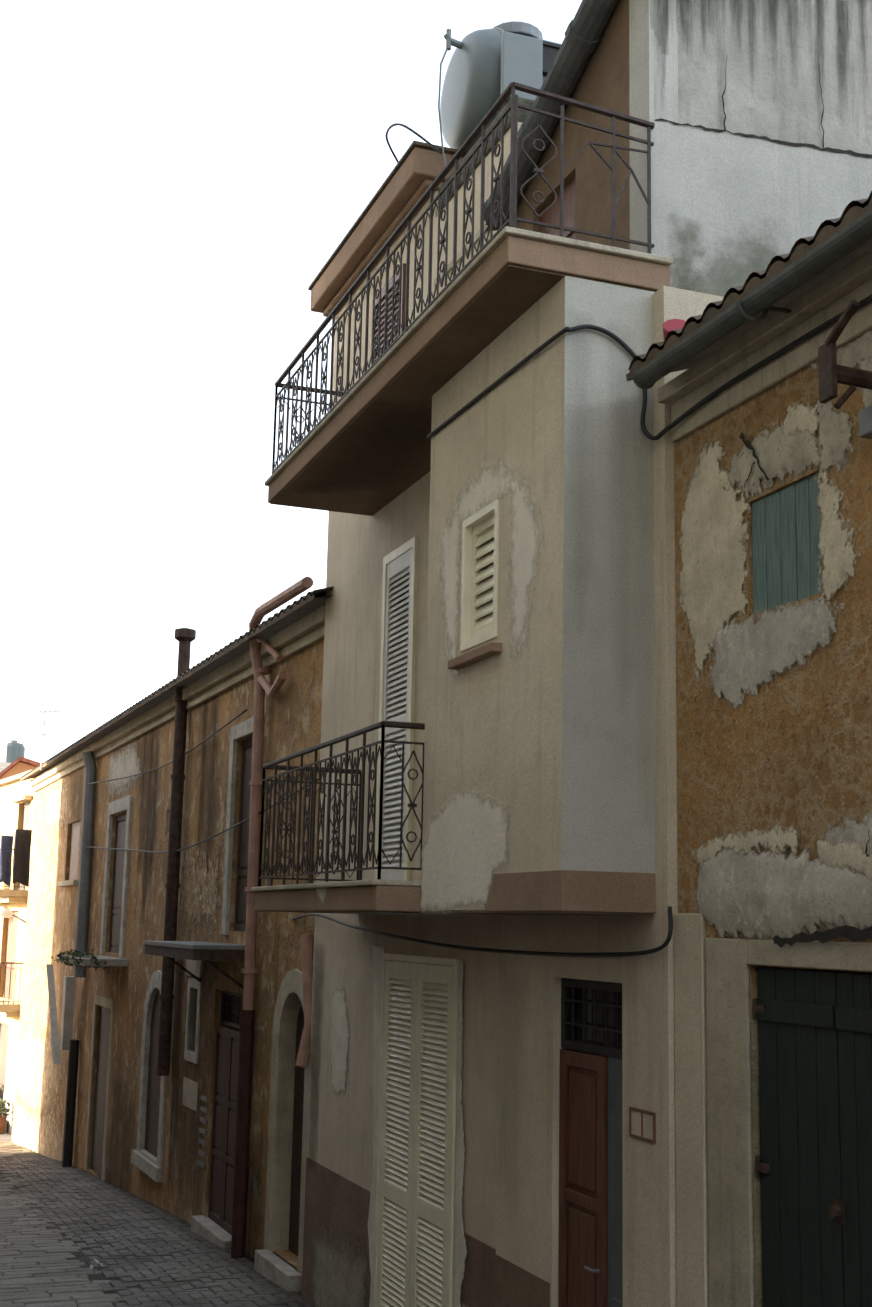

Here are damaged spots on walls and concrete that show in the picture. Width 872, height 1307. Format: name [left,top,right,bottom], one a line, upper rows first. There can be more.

damp [838,0,846,81]
crack [655,60,872,158]
peeling [678,436,863,710]
spalling [690,823,872,940]